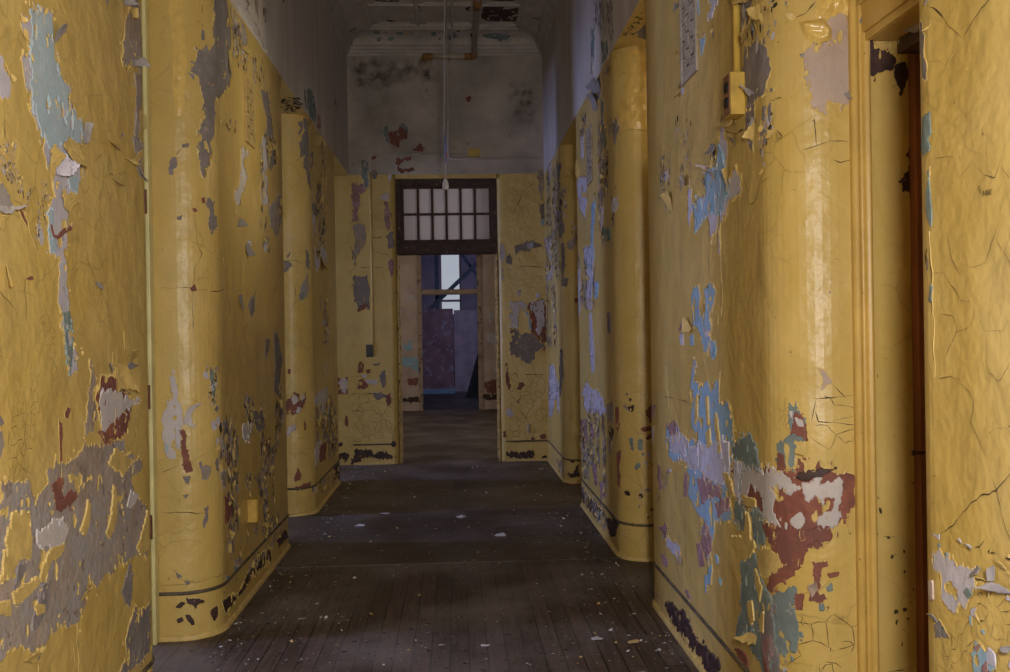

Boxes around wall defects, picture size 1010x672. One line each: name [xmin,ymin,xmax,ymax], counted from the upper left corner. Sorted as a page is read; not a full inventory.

peeling [364,0,520,42]
crack [923,0,989,77]
crack [13,199,39,252]
crack [1,264,60,479]
peeling [0,0,153,672]
peeling [168,0,338,300]
peeling [483,0,862,672]
crack [944,220,1010,381]
peeling [161,331,419,625]
crack [942,474,1010,538]
peeling [926,533,1010,672]